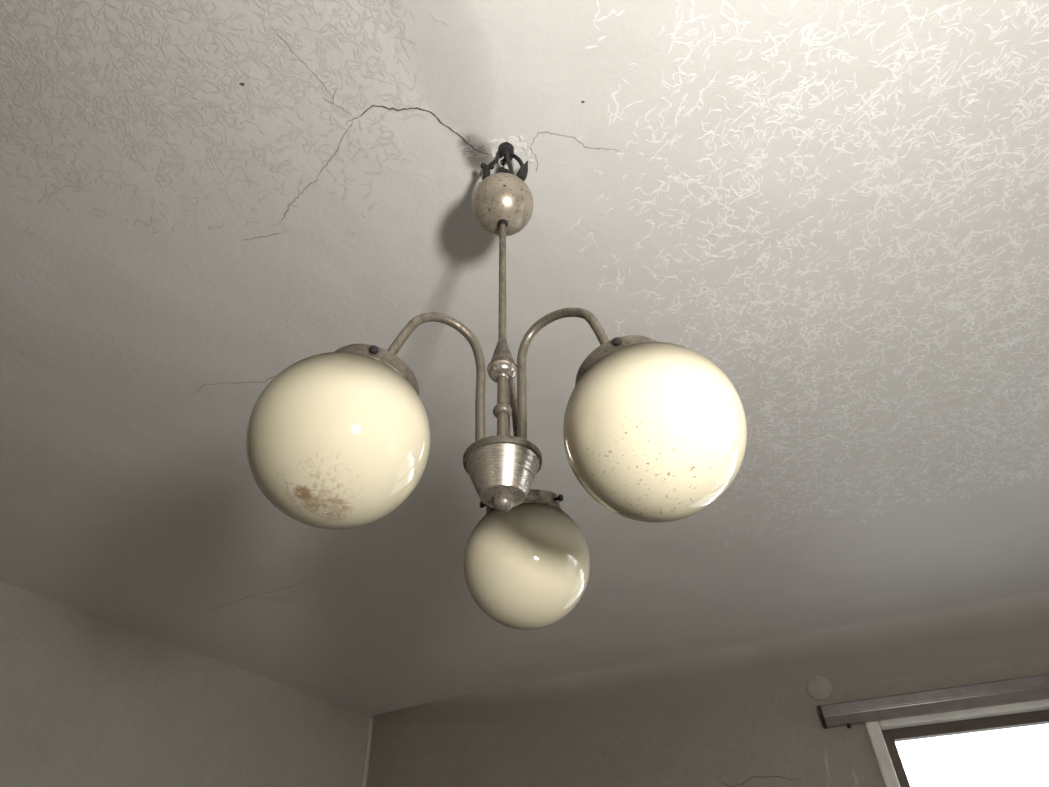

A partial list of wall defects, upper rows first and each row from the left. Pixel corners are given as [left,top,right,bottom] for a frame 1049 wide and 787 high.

crack [242,26,490,241]
crack [527,131,620,171]